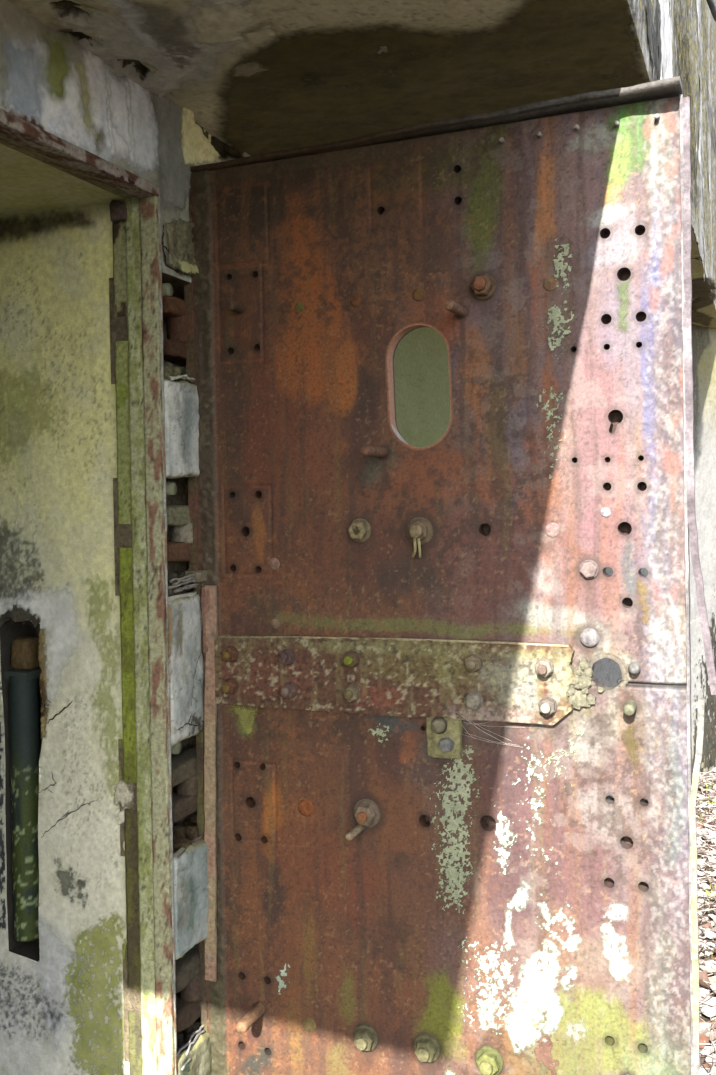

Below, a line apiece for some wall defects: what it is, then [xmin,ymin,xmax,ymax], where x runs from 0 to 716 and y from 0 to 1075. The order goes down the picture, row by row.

damp [0,212,91,240]
damp [219,0,716,447]
corrosion [618,282,629,331]
damp [0,522,77,699]
spalling [0,604,49,739]
corrosion [231,705,257,735]
corrosion [625,728,638,763]
damp [692,613,716,773]
damp [56,862,88,908]
damp [0,923,86,1040]